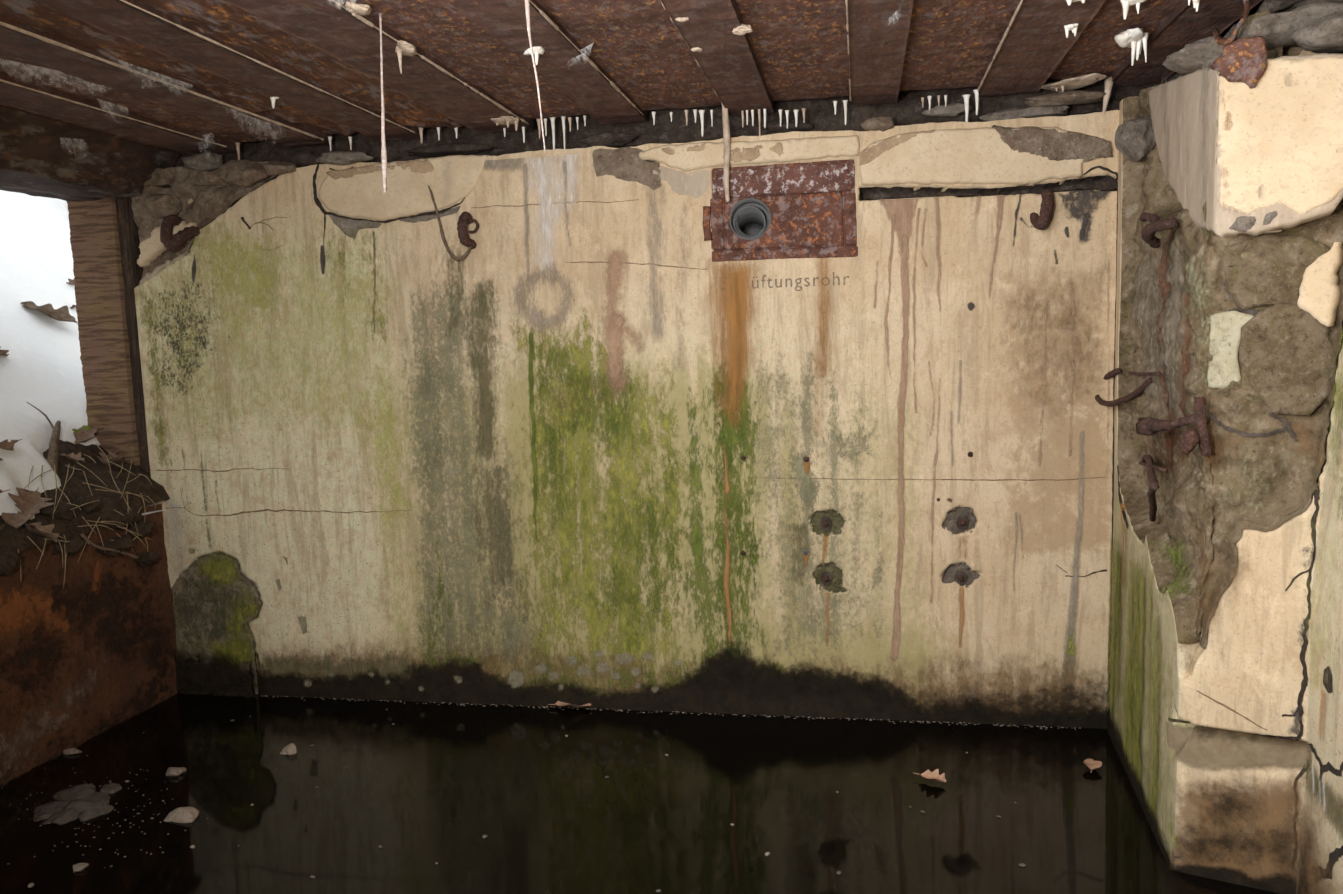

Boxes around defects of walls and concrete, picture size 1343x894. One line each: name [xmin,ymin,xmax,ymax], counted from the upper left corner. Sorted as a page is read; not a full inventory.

damp [1064,23,1079,38]
damp [1114,0,1149,66]
spalling [1267,46,1303,59]
spalling [1122,84,1160,124]
spalling [131,160,317,285]
rust [715,265,752,422]
spalling [859,125,1343,649]
crack [1209,412,1298,442]
crack [156,468,411,516]
damp [173,196,1330,894]
rust [0,584,71,640]
crack [1168,467,1343,894]